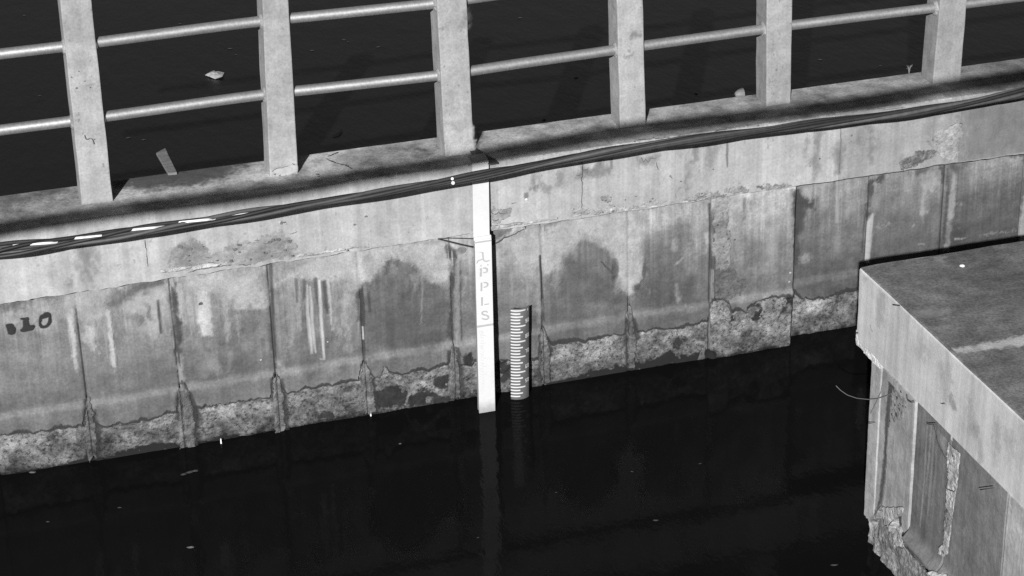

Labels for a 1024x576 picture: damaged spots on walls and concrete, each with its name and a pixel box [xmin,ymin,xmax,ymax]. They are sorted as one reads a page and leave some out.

spalling [0,352,477,475]
water stain [123,241,463,397]
spalling [494,359,511,393]
water stain [510,211,642,317]
spalling [529,183,883,388]
spalling [873,505,947,576]